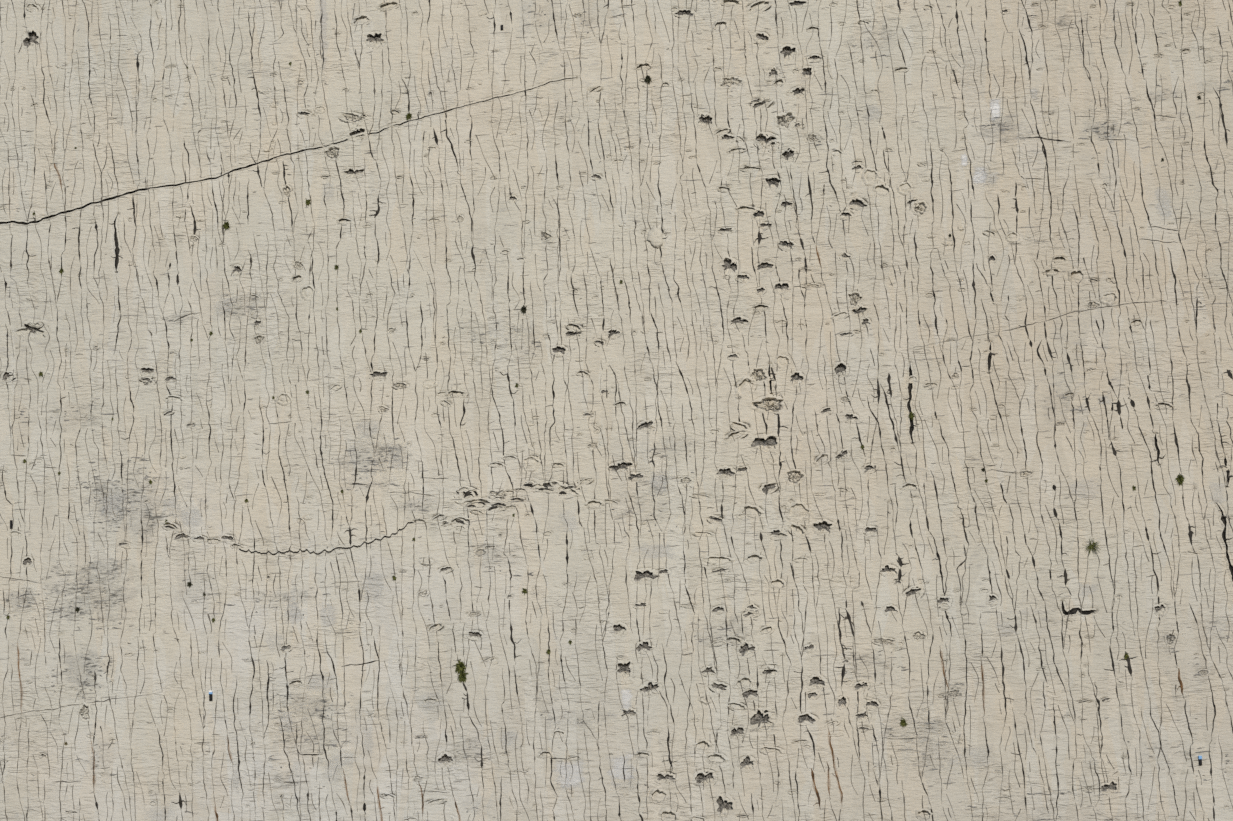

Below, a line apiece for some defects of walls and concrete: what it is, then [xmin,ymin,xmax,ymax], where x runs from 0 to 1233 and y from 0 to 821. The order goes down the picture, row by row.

spalling [350,1,402,51]
flaking render [672,0,809,34]
crack [856,0,913,93]
spalling [719,255,825,328]
spalling [714,367,850,541]
crack [200,542,227,650]
crack [0,724,38,821]
crack [106,741,167,821]
crack [616,664,653,821]
spalling [611,622,662,720]
crack [719,762,783,821]
spalling [648,596,881,821]